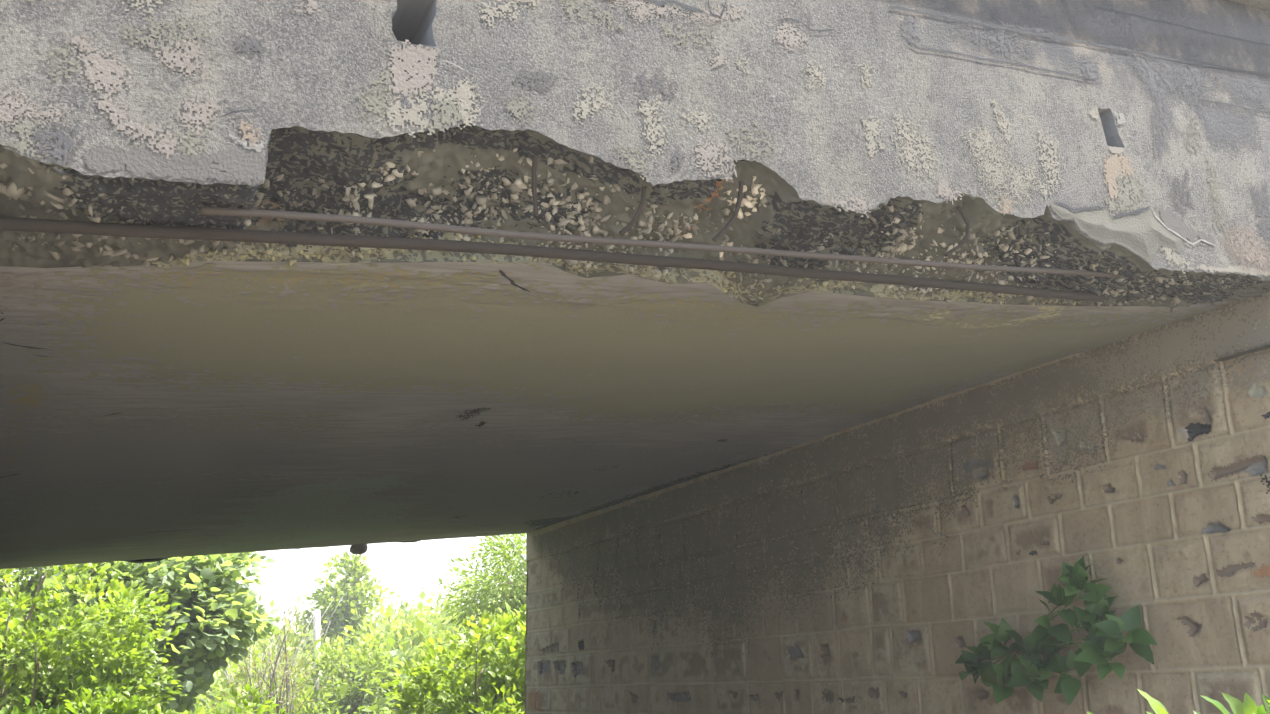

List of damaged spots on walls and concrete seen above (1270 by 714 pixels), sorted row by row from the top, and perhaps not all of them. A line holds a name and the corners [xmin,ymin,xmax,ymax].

damp [294,0,321,16]
damp [356,39,484,138]
damp [478,0,539,28]
damp [572,80,614,125]
spalling [0,124,1270,313]
damp [559,0,750,74]
damp [614,68,778,182]
damp [769,16,827,90]
damp [821,193,876,218]
damp [861,99,1066,215]
damp [944,0,1270,277]
damp [0,263,1270,657]